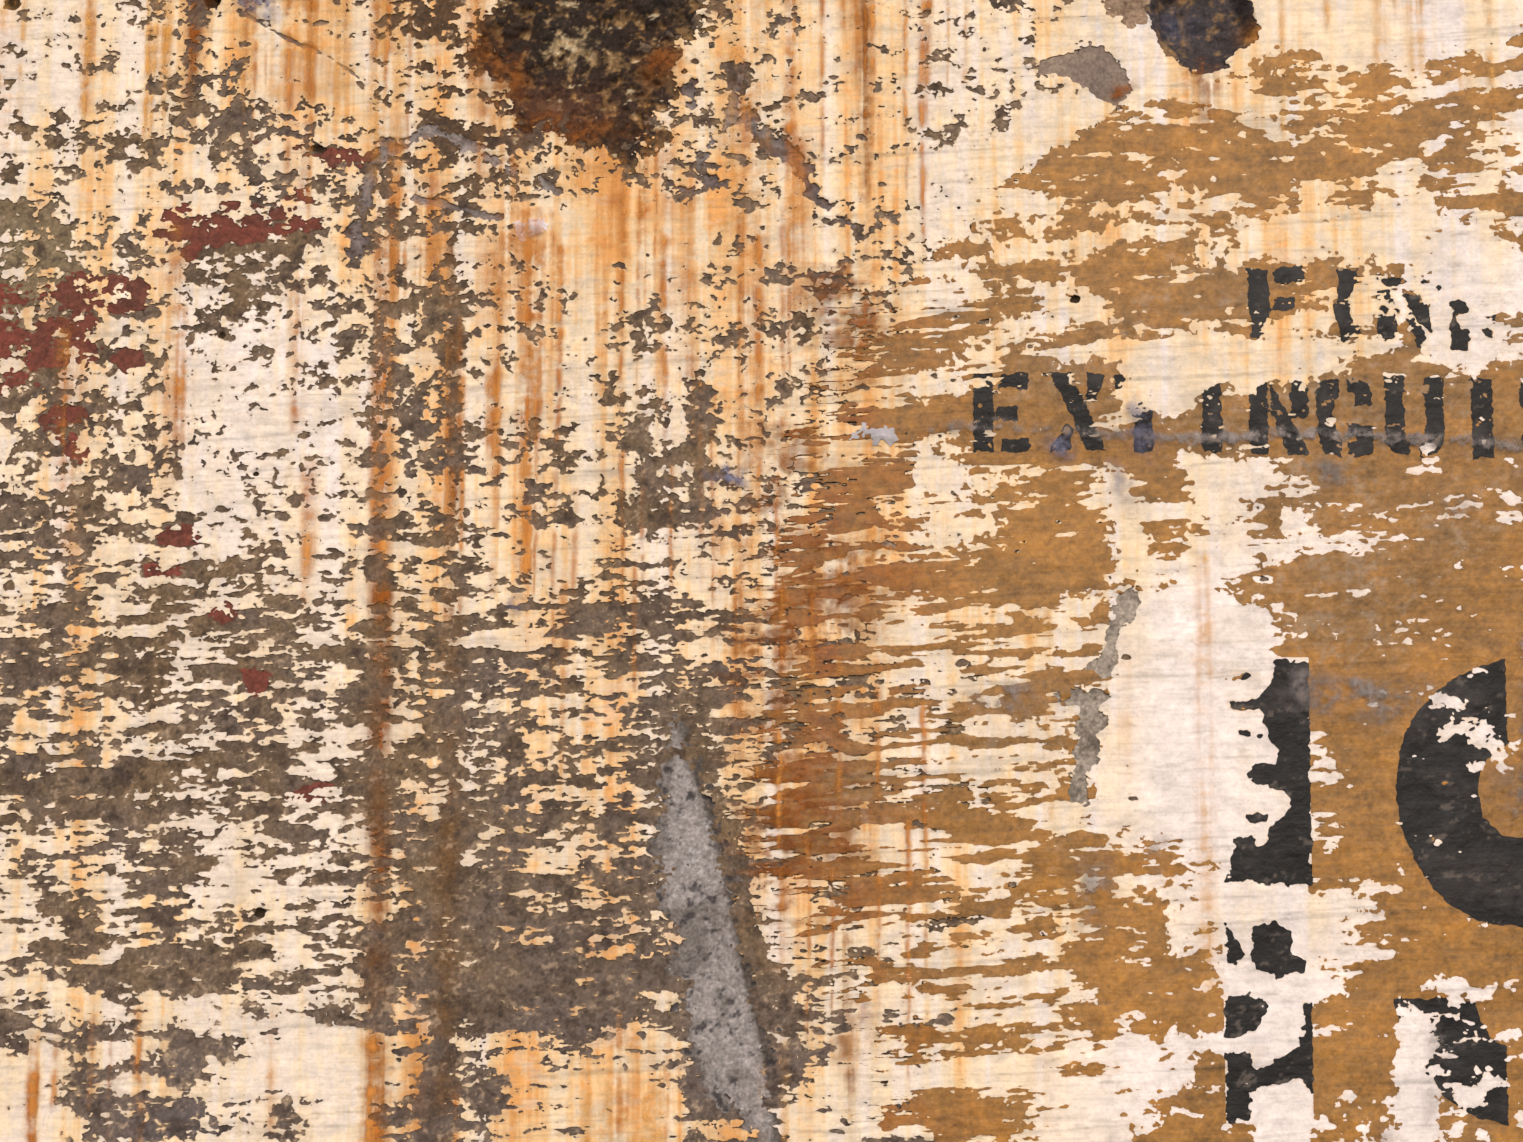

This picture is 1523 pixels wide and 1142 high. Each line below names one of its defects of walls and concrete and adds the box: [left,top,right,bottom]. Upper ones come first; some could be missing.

peeling [0,12,121,110]
corrosion [903,0,949,125]
peeling [874,1,1034,160]
corrosion [906,143,925,207]
corrosion [521,212,563,477]
corrosion [370,358,392,517]
corrosion [486,353,501,474]
peeling [1308,717,1353,788]
peeling [1403,685,1522,777]
peeling [1308,803,1345,864]
corrosion [365,1037,384,1142]
peeling [1221,972,1523,1142]